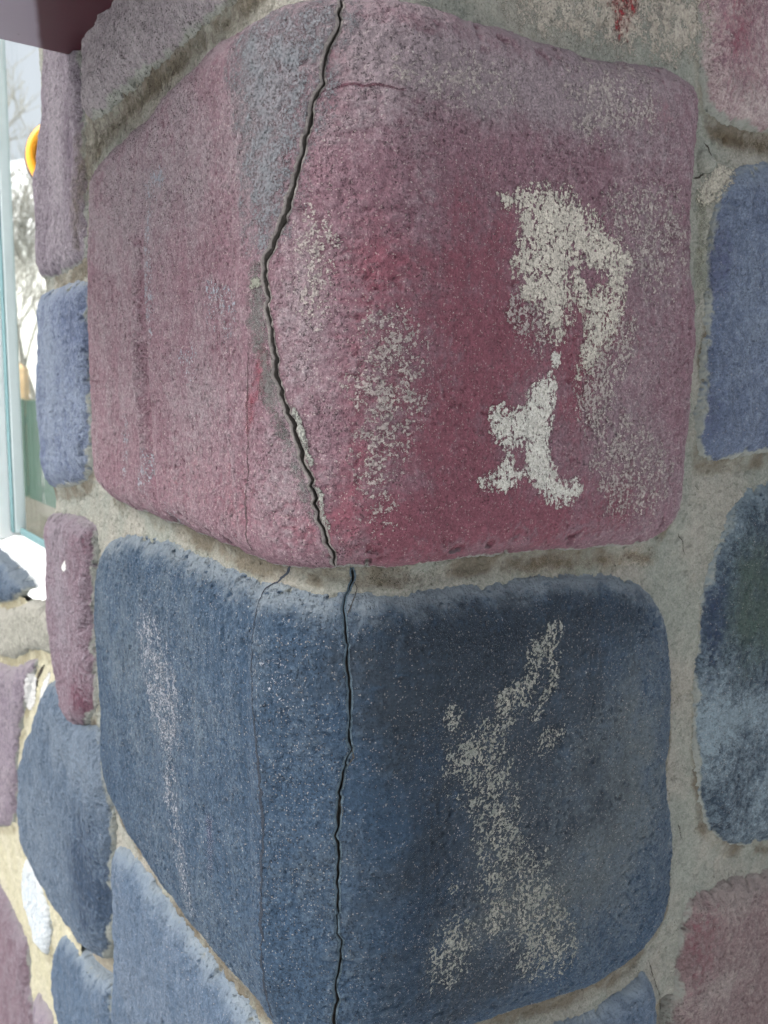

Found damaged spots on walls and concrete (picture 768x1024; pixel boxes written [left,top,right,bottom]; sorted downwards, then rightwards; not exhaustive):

peeling [562,54,662,152]
crack [244,0,406,1024]
peeling [477,175,690,529]
peeling [426,619,582,996]